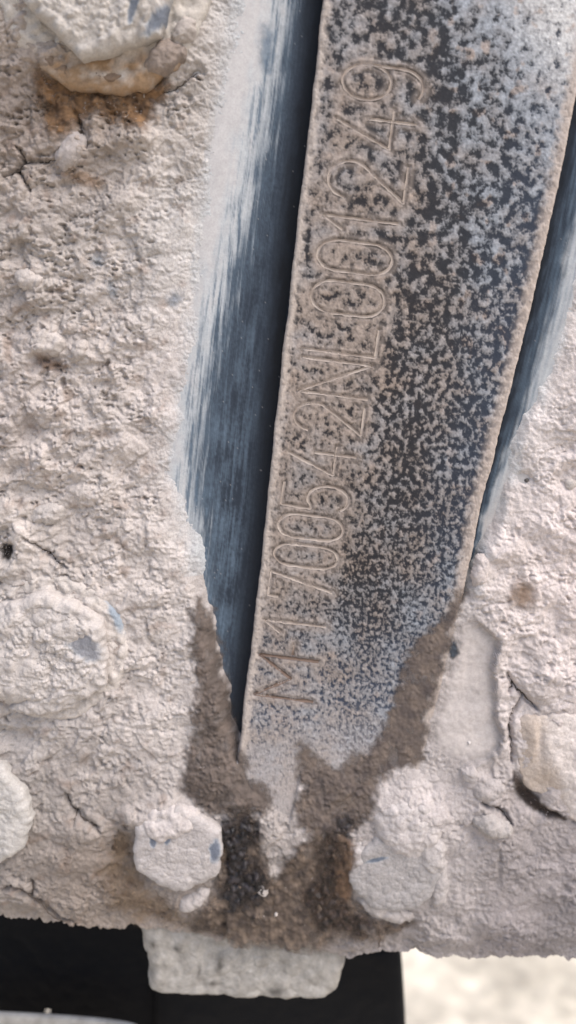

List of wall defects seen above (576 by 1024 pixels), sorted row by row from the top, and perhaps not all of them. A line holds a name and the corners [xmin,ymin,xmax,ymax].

rust [34,68,171,134]
crack [6,149,55,187]
crack [507,672,535,753]
leakage [183,593,464,954]